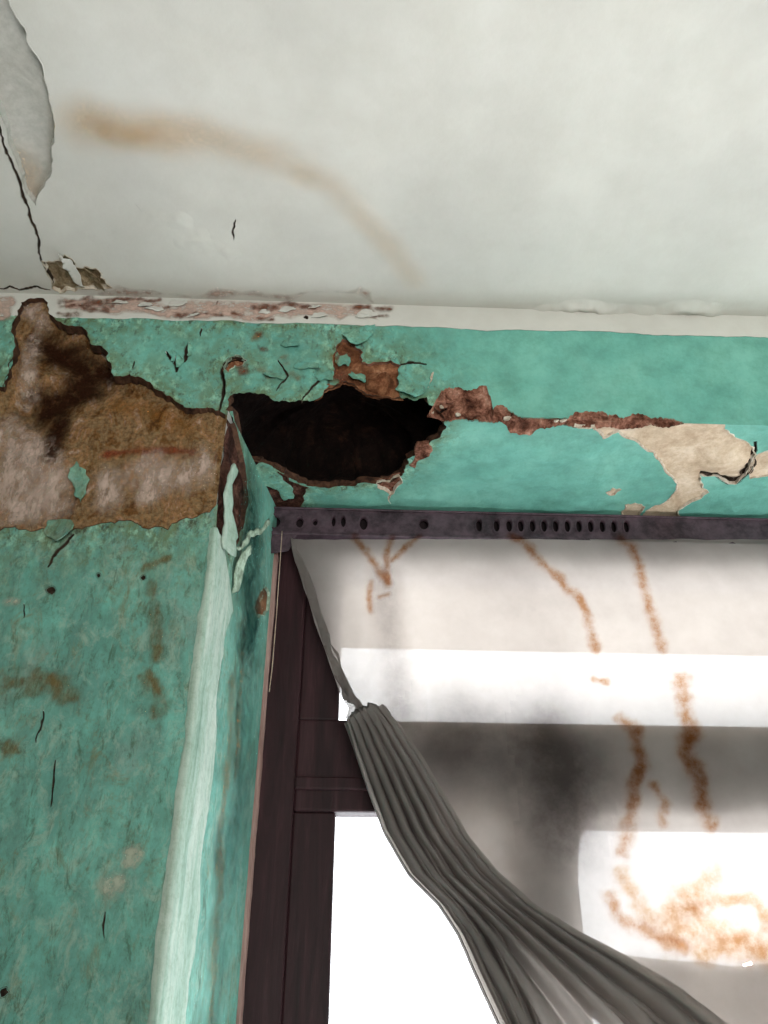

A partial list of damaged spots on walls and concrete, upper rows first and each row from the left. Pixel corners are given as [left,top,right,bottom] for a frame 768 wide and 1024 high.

peeling [0,0,56,206]
crack [0,126,54,291]
crack [218,354,247,411]
crack [276,360,320,403]
flaking render [0,253,768,593]